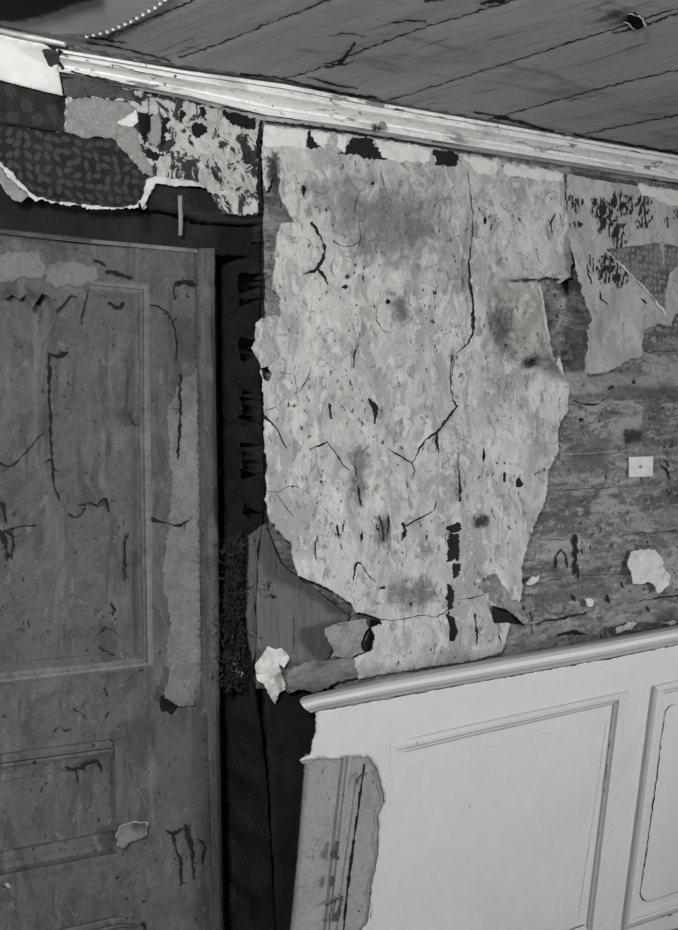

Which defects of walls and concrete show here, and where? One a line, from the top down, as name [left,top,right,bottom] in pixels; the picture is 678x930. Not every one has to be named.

peeling [261,125,678,206]
crack [389,355,458,477]
peeling [627,549,670,593]
spalling [362,619,381,651]
peeling [164,665,194,707]
peeling [115,821,148,849]